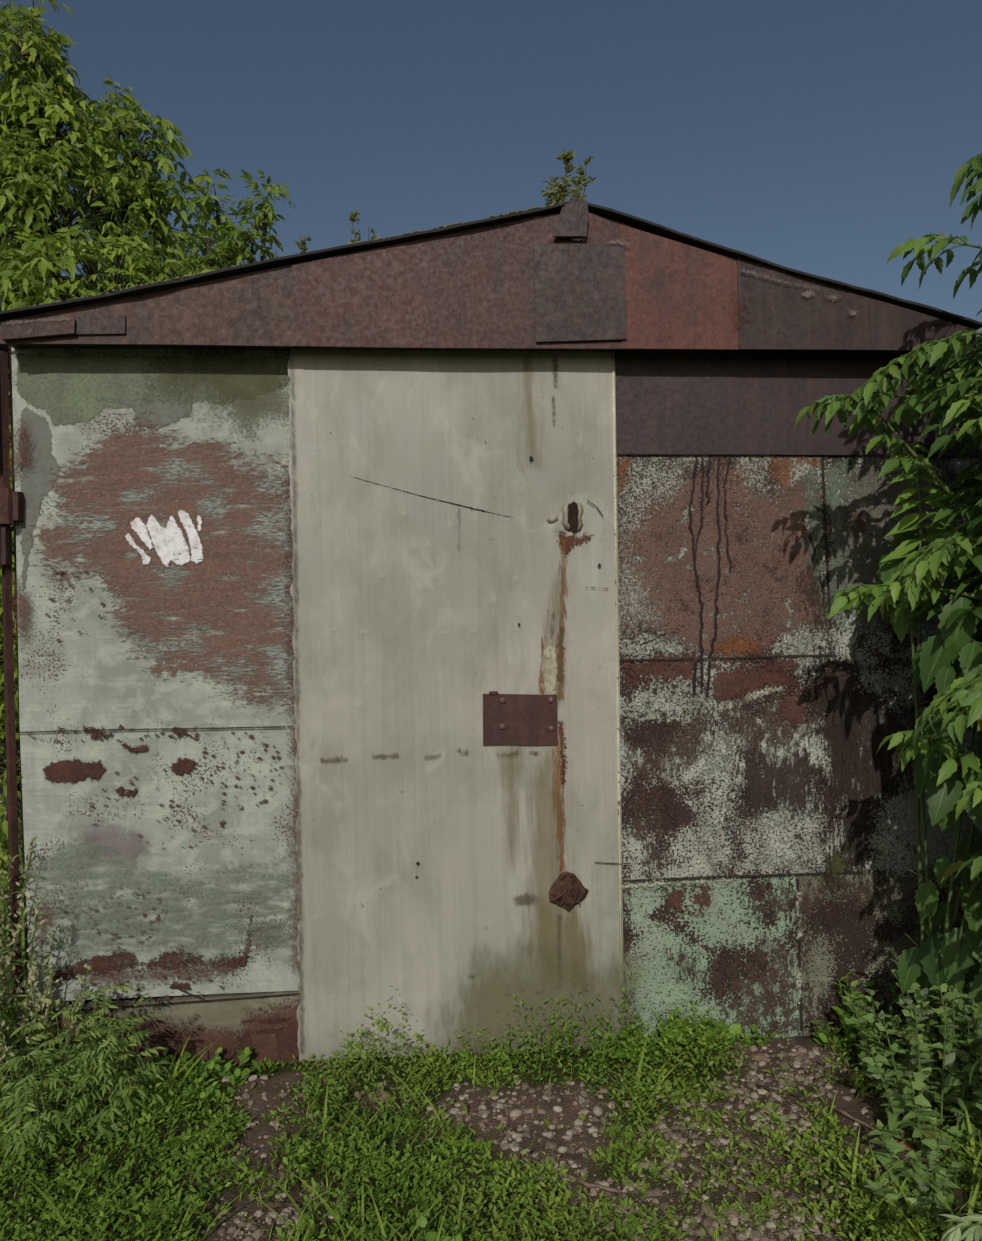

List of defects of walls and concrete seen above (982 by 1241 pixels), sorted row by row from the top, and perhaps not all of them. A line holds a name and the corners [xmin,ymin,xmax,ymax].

corrosion [10,576,36,649]
peeling [15,353,295,714]
corrosion [555,530,594,699]
corrosion [617,456,632,497]
leakage [689,456,732,697]
corrosion [769,455,822,490]
corrosion [792,557,842,654]
corrosion [620,634,827,918]
corrosion [42,1000,301,1066]
corrosion [622,884,636,1037]
corrosion [663,868,879,1039]